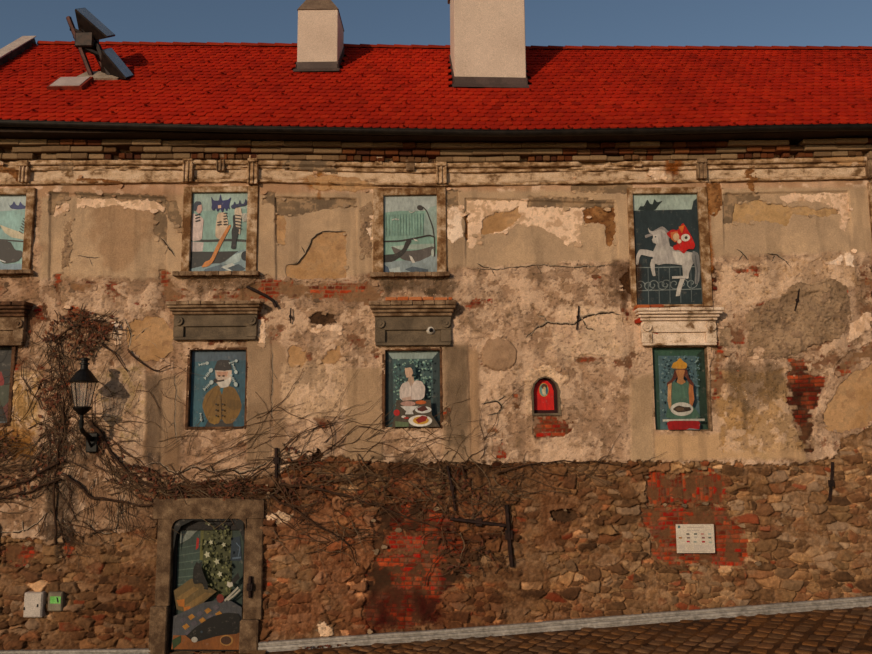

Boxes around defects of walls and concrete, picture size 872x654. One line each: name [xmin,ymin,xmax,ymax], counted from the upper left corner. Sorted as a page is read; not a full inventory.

peeling [48,162,182,321]
spalling [157,232,384,335]
crack [288,230,345,265]
spalling [261,160,378,259]
peeling [446,177,633,249]
spalling [711,265,721,298]
spalling [706,166,853,231]
peeling [824,249,857,267]
spalling [109,316,174,362]
crack [526,311,620,338]
spalling [158,277,872,643]
spalling [0,521,158,650]